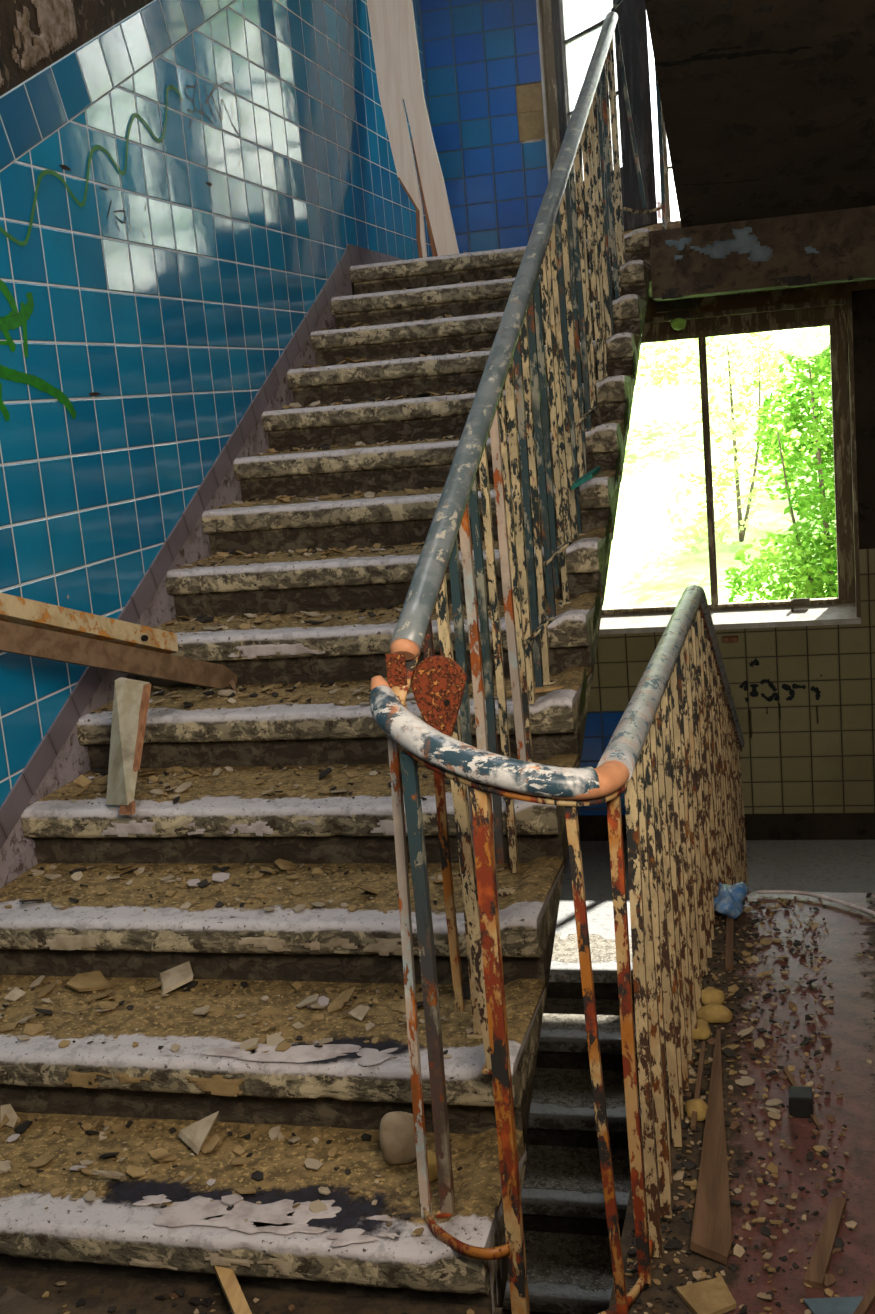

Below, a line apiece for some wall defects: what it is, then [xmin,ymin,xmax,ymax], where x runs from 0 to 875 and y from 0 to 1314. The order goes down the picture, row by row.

flaking render [0,0,78,71]
peeling [516,83,545,143]
peeling [132,1179,399,1247]